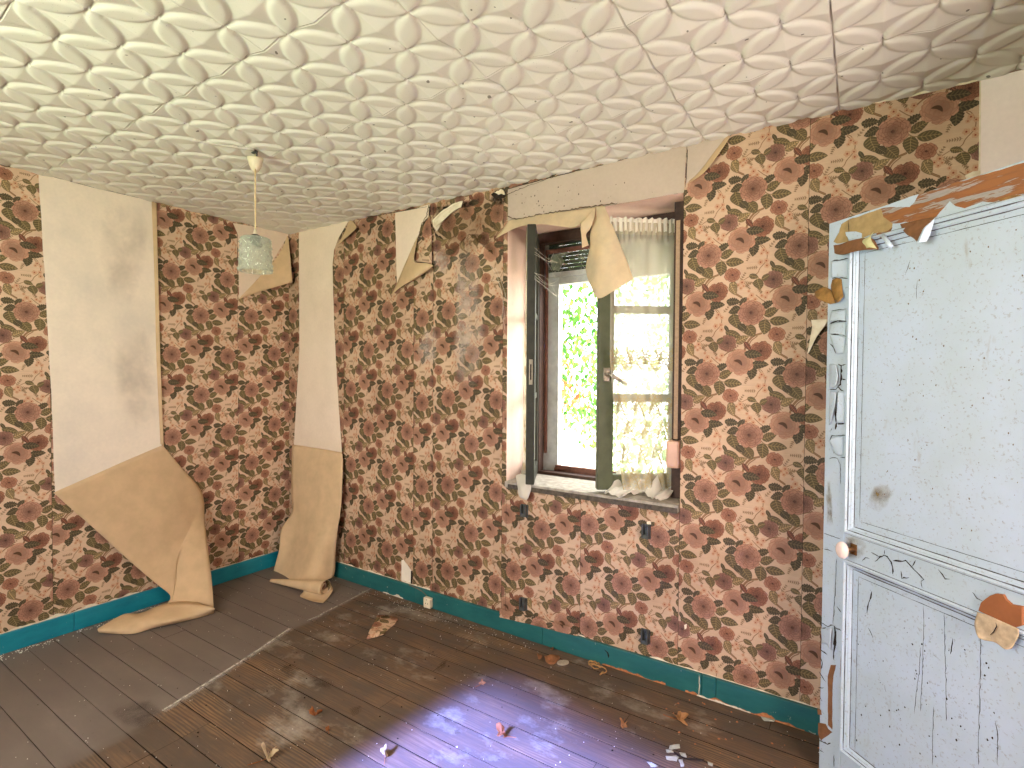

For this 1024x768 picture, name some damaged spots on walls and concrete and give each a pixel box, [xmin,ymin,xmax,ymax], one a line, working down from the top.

peeling [833,233,894,255]
peeling [900,217,936,243]
peeling [974,612,1019,649]
crack [862,550,953,764]
crack [978,624,998,765]